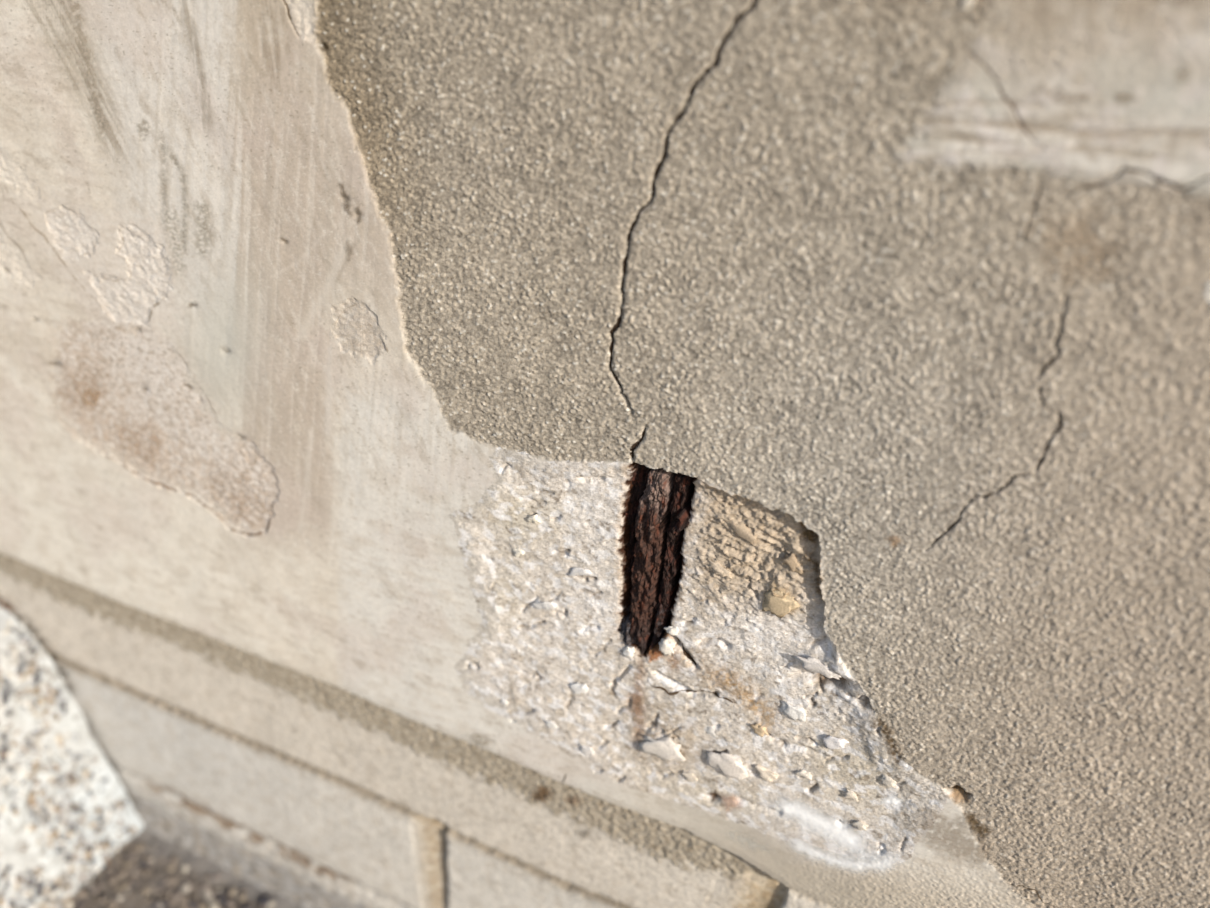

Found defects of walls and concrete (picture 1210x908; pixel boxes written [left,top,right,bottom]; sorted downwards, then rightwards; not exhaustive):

peeling [0,146,282,539]
crack [609,0,757,458]
crack [959,41,1034,142]
crack [927,275,1086,549]
crack [1073,168,1210,192]
corrosion [620,463,695,661]
spalling [449,447,951,864]